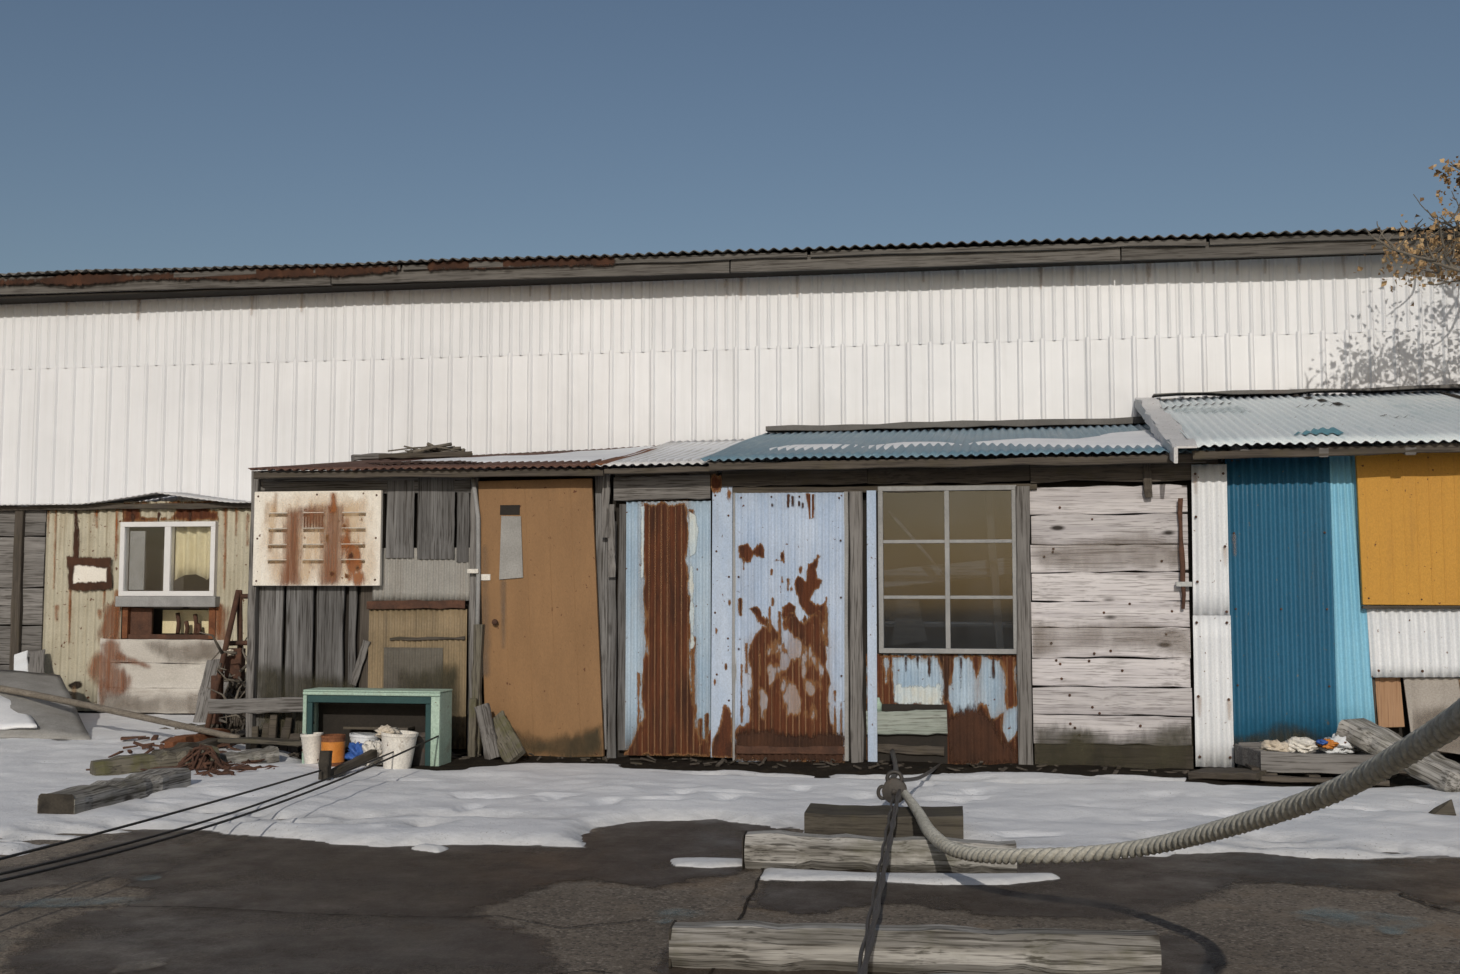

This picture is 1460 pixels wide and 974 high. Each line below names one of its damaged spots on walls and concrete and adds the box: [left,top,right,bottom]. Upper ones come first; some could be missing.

corrosion [270,494,364,586]
corrosion [711,474,731,500]
corrosion [48,500,248,695]
corrosion [624,500,845,763]
corrosion [866,654,1018,765]
crack [737,868,764,920]